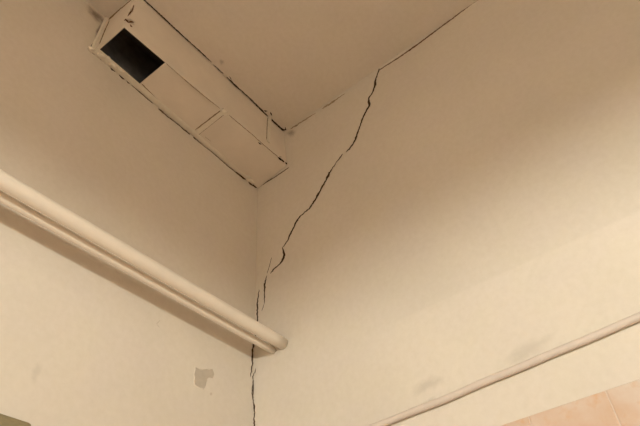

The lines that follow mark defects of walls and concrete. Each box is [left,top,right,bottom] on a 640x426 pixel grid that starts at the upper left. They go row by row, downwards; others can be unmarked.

peeling [193,367,215,395]
crack [250,2,475,426]